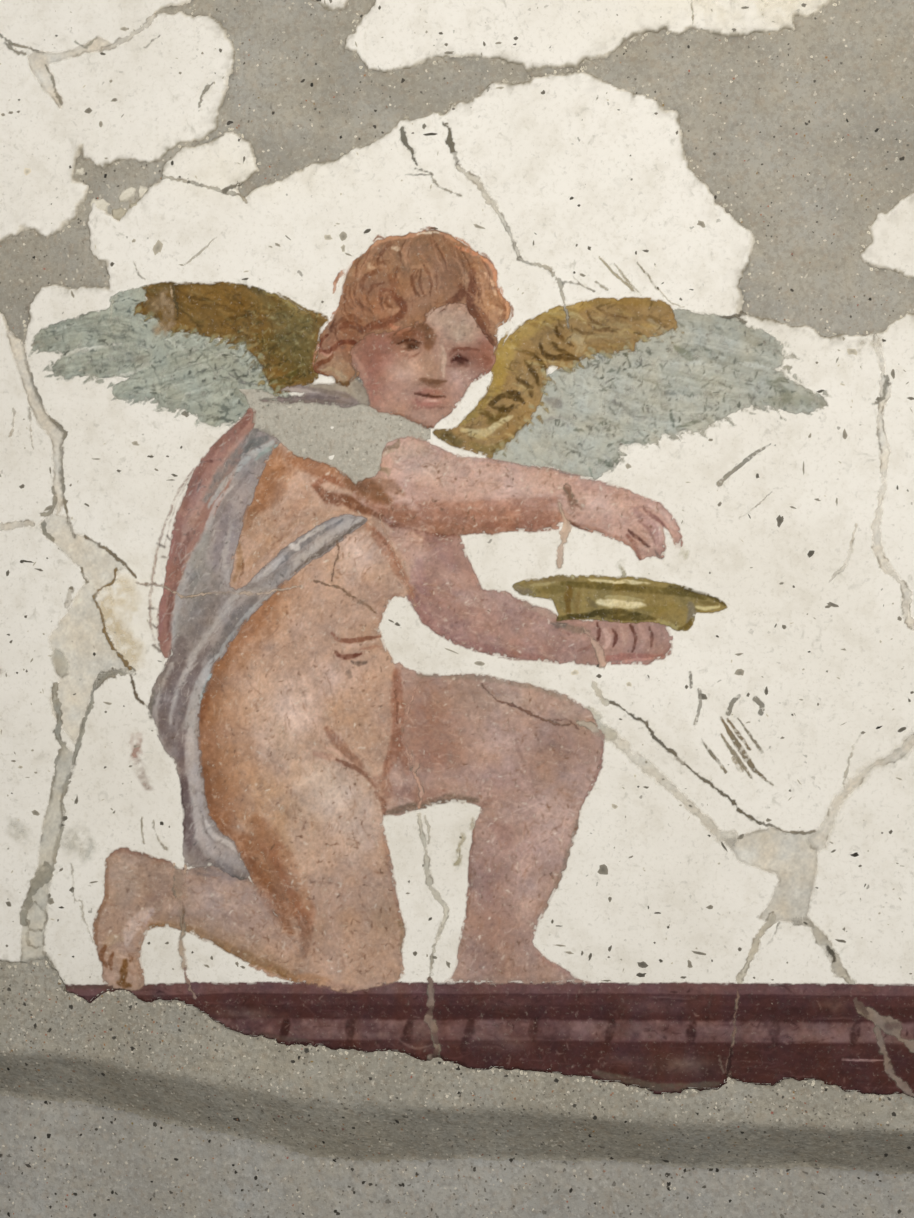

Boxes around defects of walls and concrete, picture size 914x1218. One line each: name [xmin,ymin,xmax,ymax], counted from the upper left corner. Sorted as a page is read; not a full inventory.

crack [0,14,160,107]
crack [170,283,179,316]
crack [198,83,213,107]
flaking render [0,0,914,355]
crack [400,123,595,328]
crack [0,333,211,999]
crack [240,542,376,613]
flaking render [239,389,431,484]
crack [557,485,577,568]
crack [481,627,914,850]
crack [830,334,914,628]
crack [719,912,914,1098]